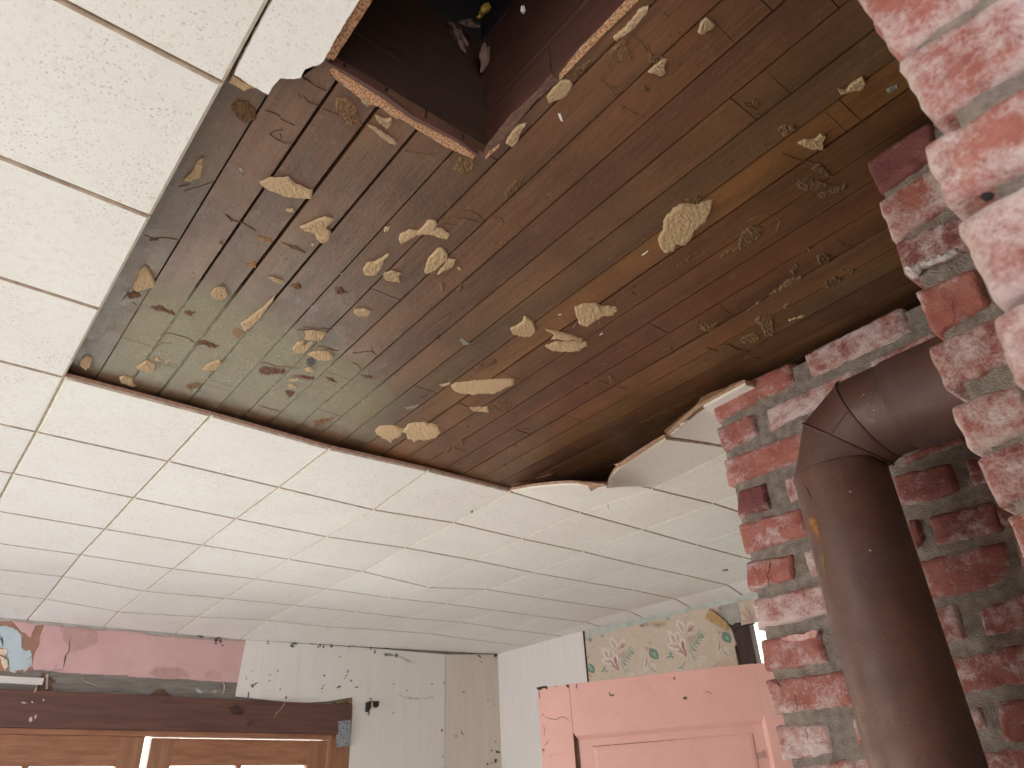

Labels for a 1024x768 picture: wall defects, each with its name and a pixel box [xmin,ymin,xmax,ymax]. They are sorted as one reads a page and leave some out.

peeling [0,621,246,697]